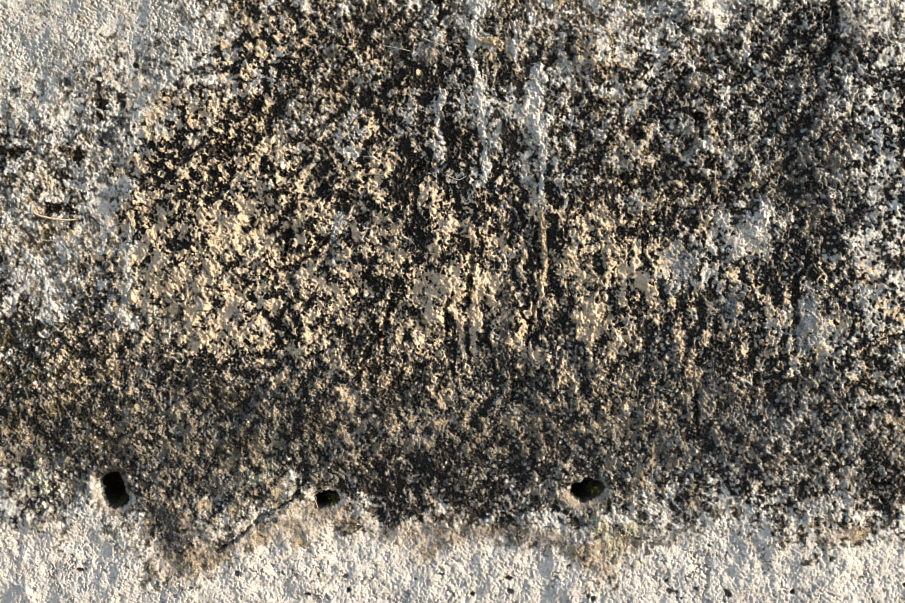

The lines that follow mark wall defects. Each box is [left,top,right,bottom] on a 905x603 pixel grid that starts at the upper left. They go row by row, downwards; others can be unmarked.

crack [822,0,839,68]
damp [889,4,905,36]
damp [46,57,126,119]
damp [131,51,156,106]
damp [130,242,154,290]
damp [0,269,24,310]
damp [137,553,159,588]
damp [594,532,619,570]
damp [612,525,654,555]